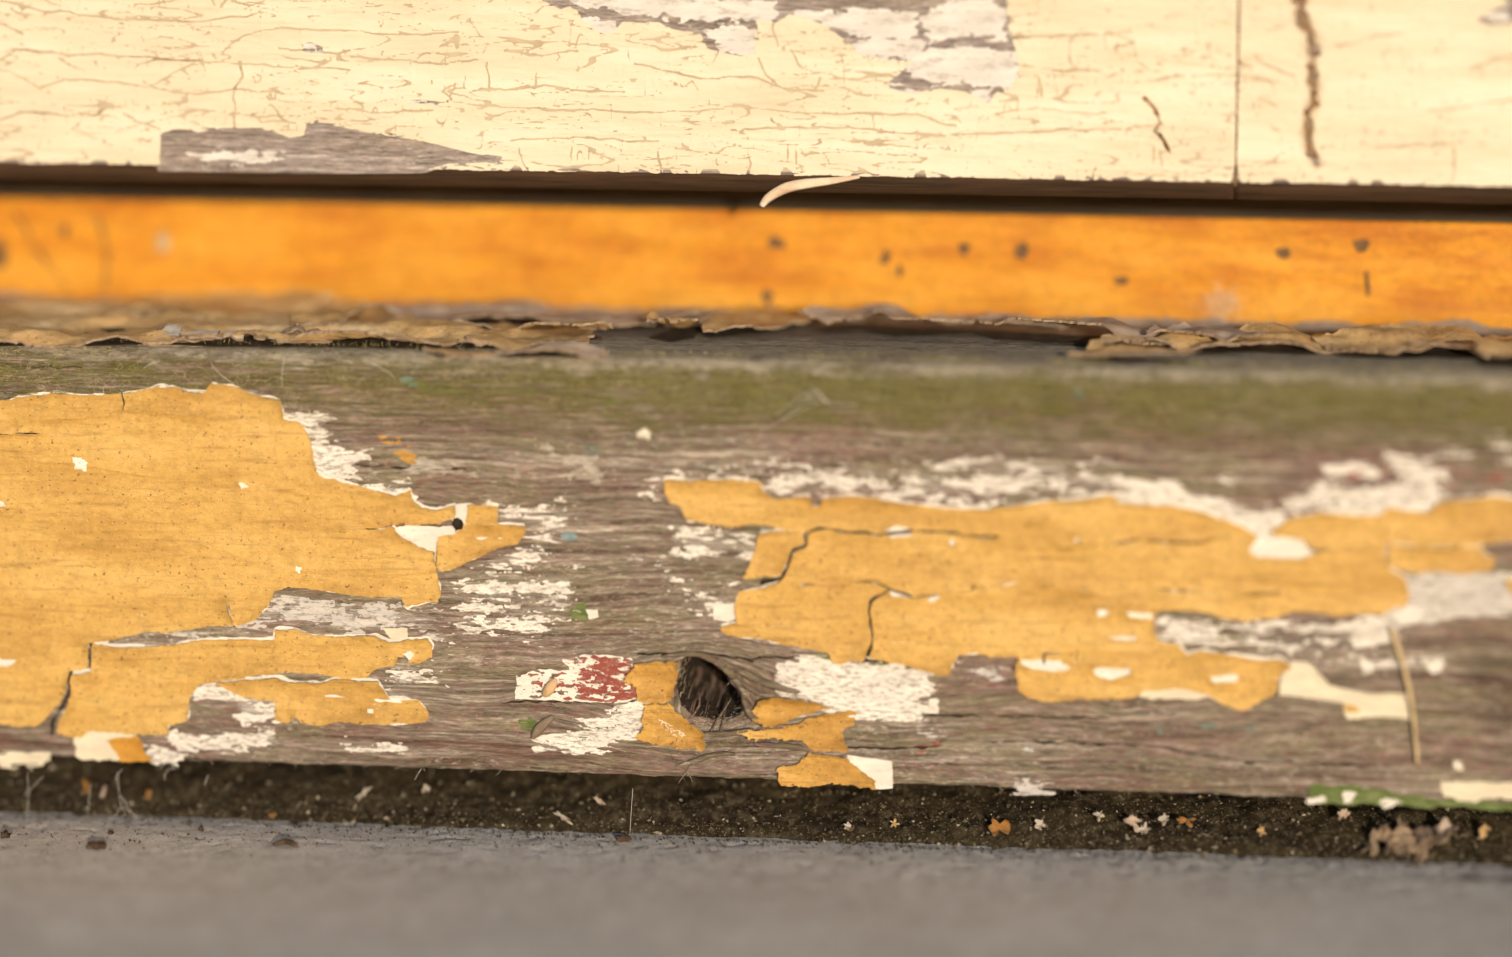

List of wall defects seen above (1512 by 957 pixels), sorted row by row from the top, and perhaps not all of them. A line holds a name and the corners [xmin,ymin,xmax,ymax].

crack [7,48,41,56]
crack [115,55,203,63]
crack [1013,33,1076,41]
crack [6,109,105,118]
peeling [157,120,504,174]
crack [1142,96,1170,153]
crack [1233,0,1241,186]
peeling [0,289,1512,367]
peeling [0,382,526,762]
peeling [663,476,1512,720]
peeling [515,654,894,790]
peeling [1306,781,1512,839]